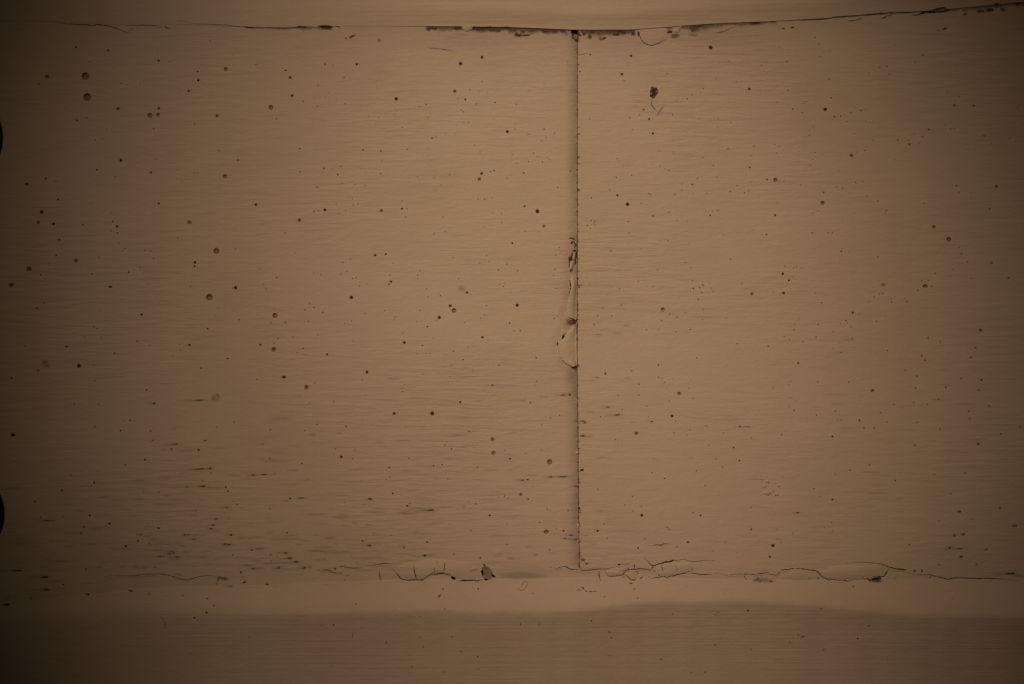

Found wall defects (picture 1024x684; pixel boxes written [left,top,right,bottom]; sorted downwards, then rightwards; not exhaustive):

crack [787,7,950,21]
peeling [564,237,577,325]
crack [549,42,1017,584]
crack [316,563,484,583]